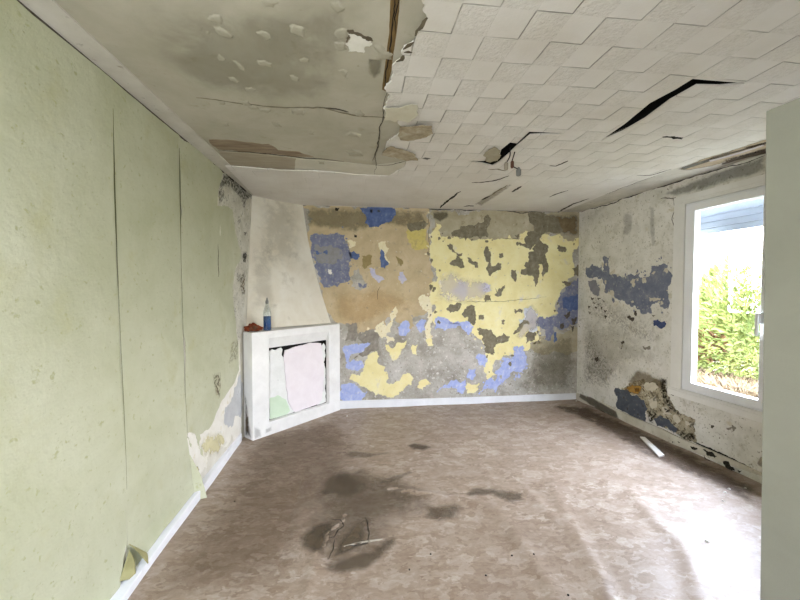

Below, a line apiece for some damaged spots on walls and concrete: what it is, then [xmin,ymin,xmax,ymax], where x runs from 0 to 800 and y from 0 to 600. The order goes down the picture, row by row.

crack [196,94,404,174]
peeling [382,104,433,161]
leakage [219,175,249,207]
peeling [303,205,579,398]
flaking render [187,365,242,474]
leakage [630,372,679,422]
leakage [559,394,750,497]
leakage [304,476,409,570]
leakage [429,507,456,518]
leakage [469,489,521,501]